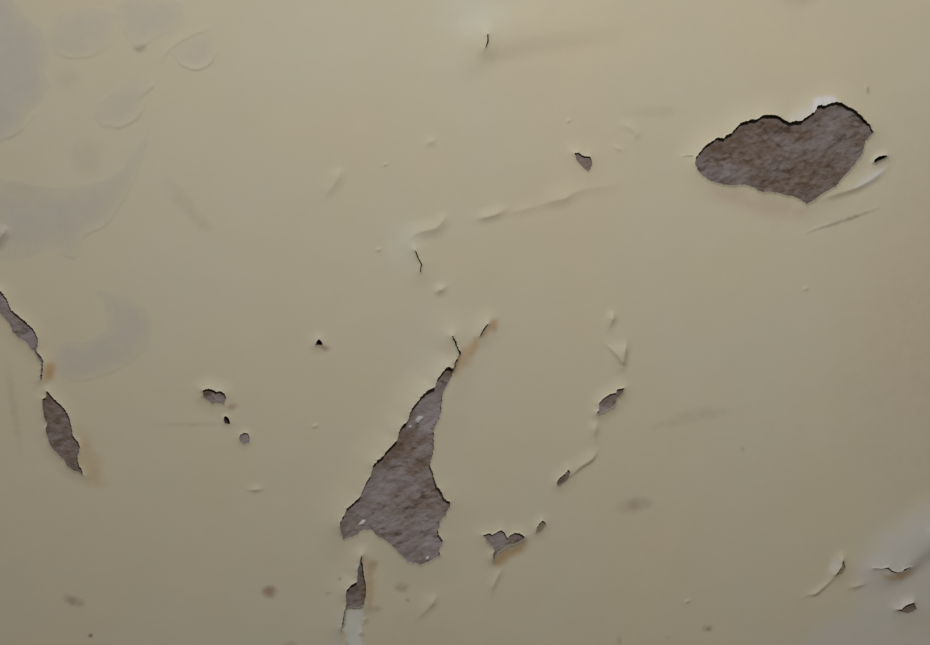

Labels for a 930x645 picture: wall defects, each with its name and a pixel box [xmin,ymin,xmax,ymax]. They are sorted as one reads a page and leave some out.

peeling [571,149,596,175]
peeling [691,98,890,208]
peeling [0,287,88,479]
flaking render [199,385,232,427]
peeling [594,385,627,418]
peeling [236,431,252,447]
peeling [336,332,464,568]
peeling [479,517,550,562]
peeling [338,551,370,645]